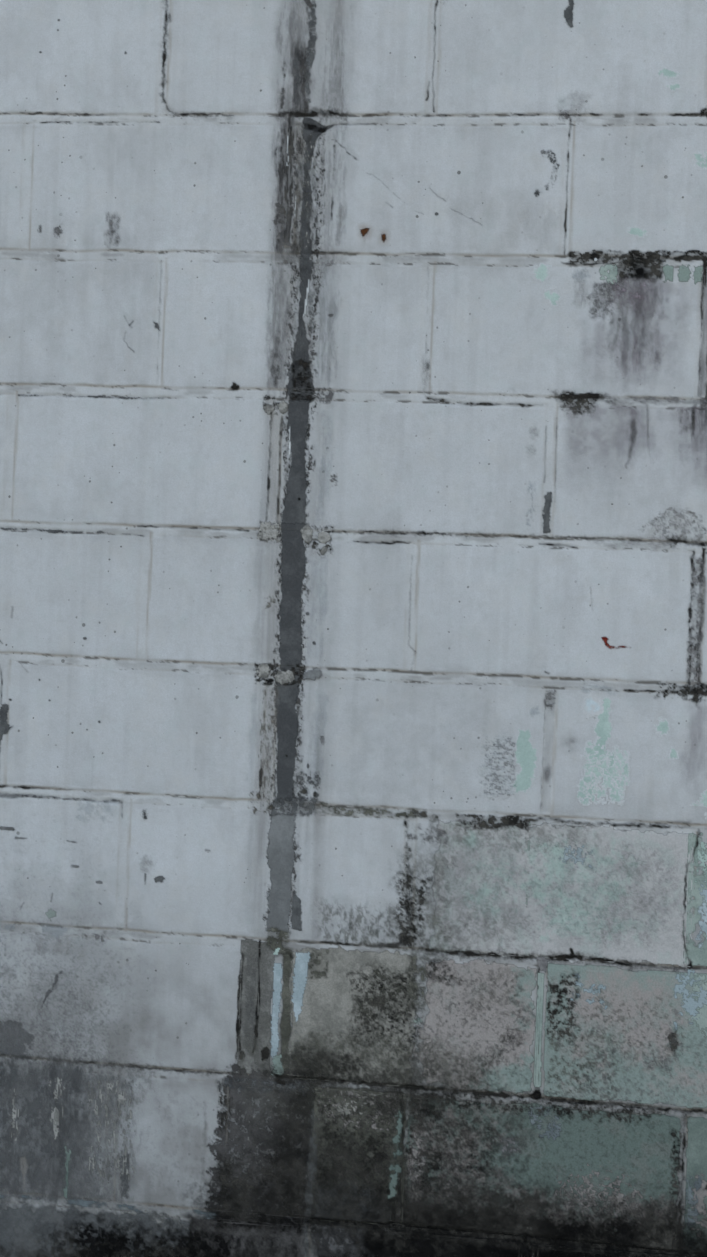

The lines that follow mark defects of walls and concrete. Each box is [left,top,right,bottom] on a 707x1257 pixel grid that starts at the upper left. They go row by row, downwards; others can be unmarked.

peeling [235,117,324,1075]
water stain [272,0,335,493]
water stain [561,392,612,414]
water stain [566,250,707,314]
water stain [0,538,707,1257]